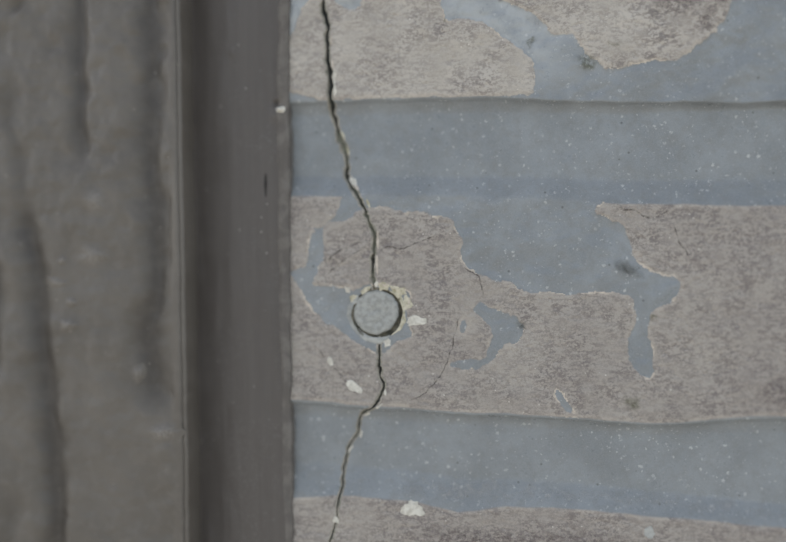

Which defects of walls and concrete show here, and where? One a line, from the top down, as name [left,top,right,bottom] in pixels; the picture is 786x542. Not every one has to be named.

crack [319,0,431,290]
peeling [289,0,786,105]
peeling [334,194,680,380]
crack [327,336,387,542]
peeling [400,500,425,516]